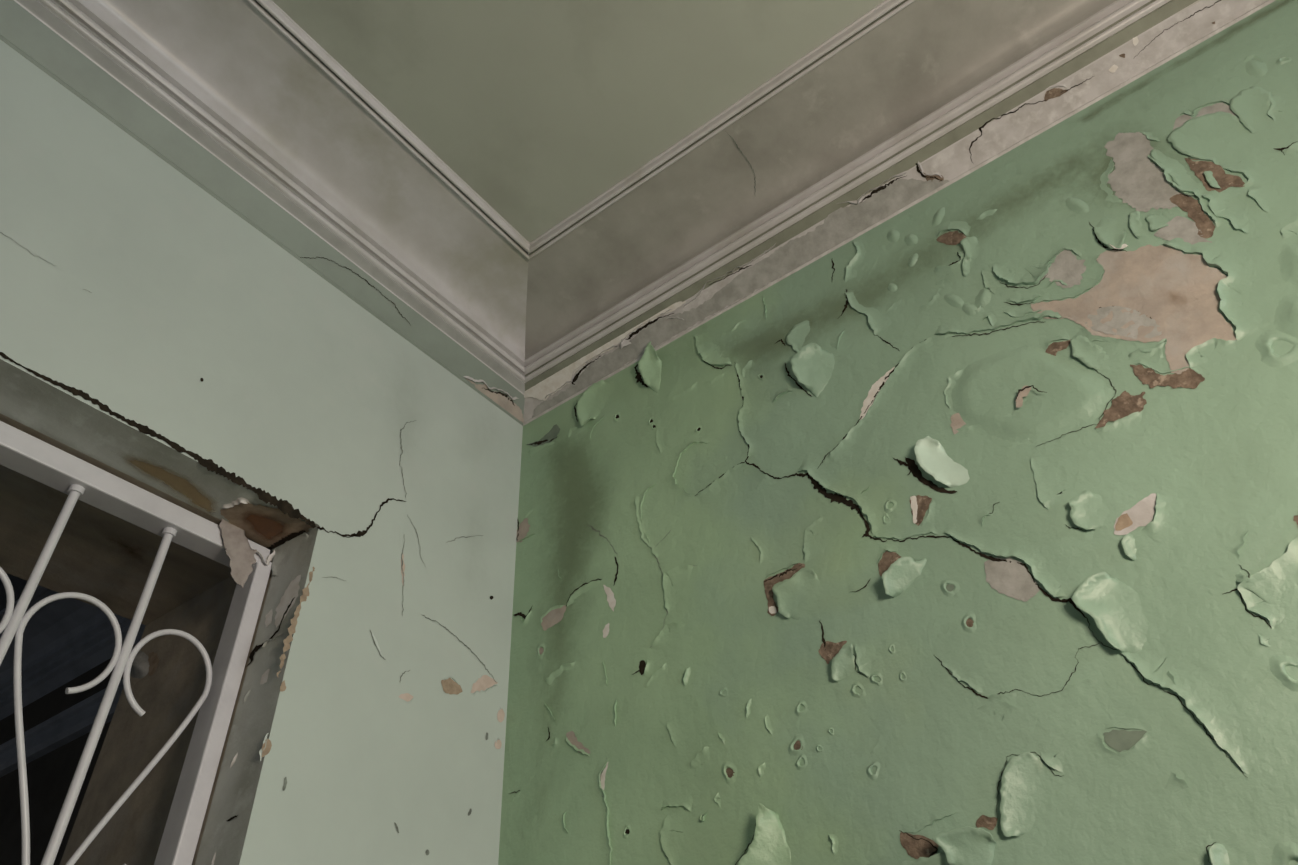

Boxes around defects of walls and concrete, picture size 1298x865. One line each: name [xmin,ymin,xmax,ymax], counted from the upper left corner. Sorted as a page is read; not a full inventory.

spalling [463,170,949,426]
spalling [919,86,1286,442]
crack [0,352,497,683]
spalling [219,497,315,703]
spalling [751,537,875,682]
peeling [852,544,927,598]
peeling [893,436,970,526]
crack [695,334,1257,775]
spalling [1002,438,1184,561]
peeling [1071,572,1148,653]
peeling [735,803,791,865]
spalling [899,748,1064,865]